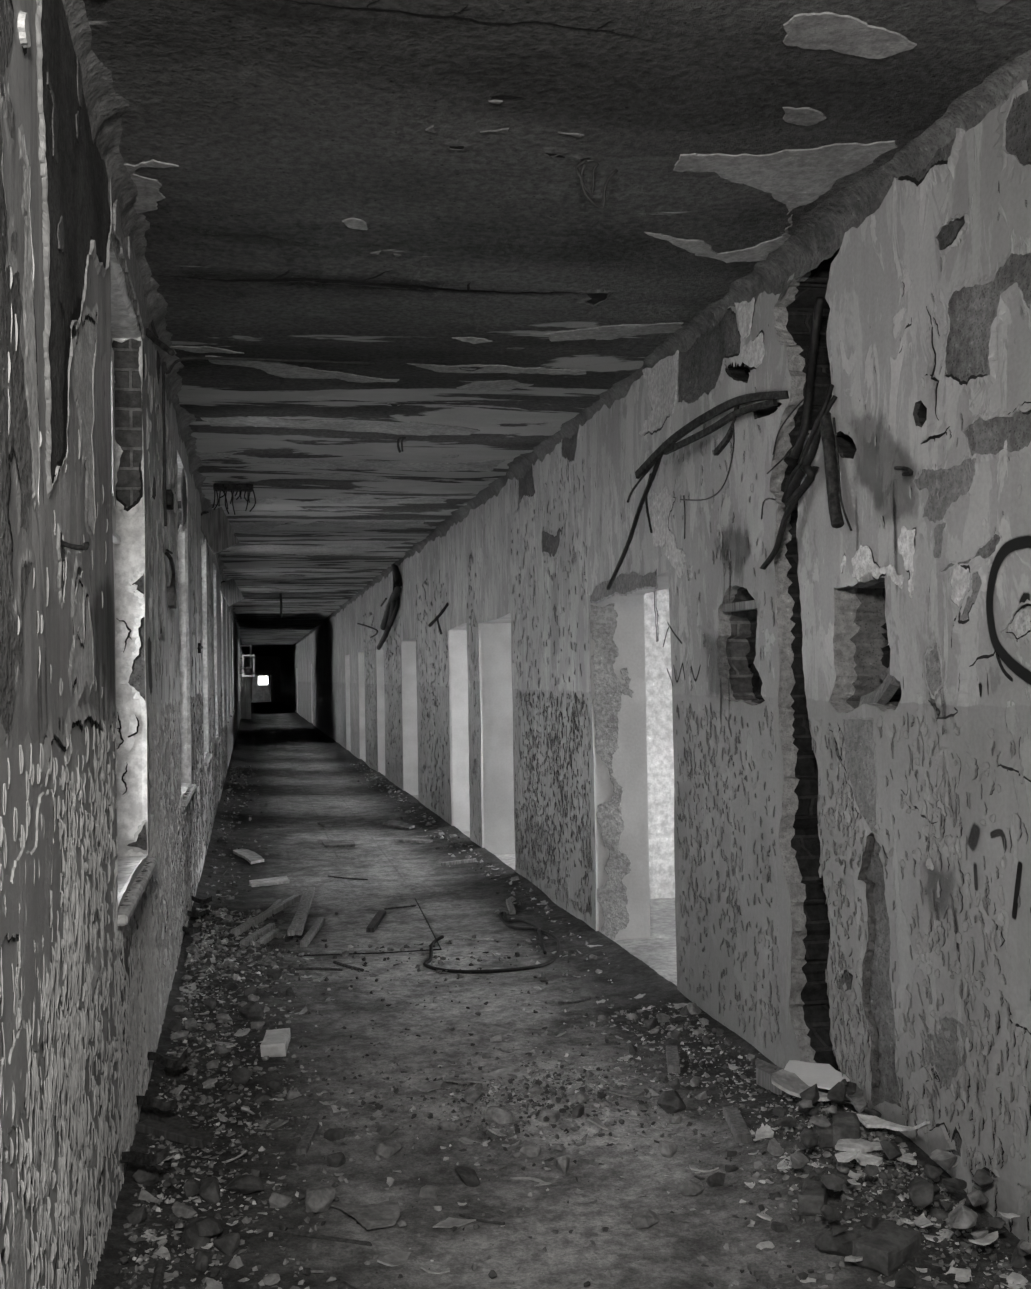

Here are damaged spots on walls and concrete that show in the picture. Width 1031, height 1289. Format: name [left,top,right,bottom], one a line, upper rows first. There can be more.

spalling [892,128,965,201]
spalling [993,74,1031,208]
peeling [201,416,480,436]
peeling [544,322,684,342]
spalling [834,431,857,459]
peeling [909,401,1031,632]
peeling [913,240,1031,427]
spalling [0,0,447,1289]
peeling [364,570,450,816]
peeling [467,550,481,841]
peeling [510,424,658,937]
spalling [639,297,782,1048]